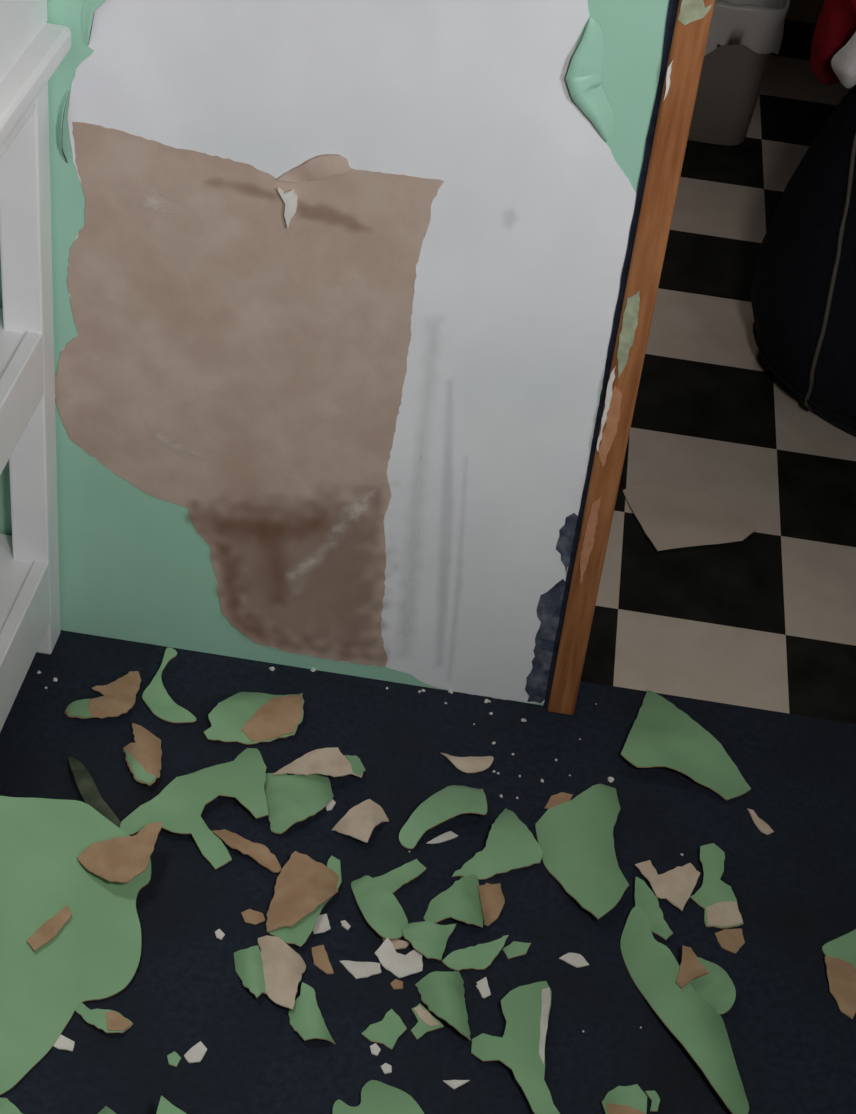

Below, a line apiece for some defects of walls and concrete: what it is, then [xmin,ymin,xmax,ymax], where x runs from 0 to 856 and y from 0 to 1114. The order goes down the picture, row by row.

peeling [56,0,637,703]